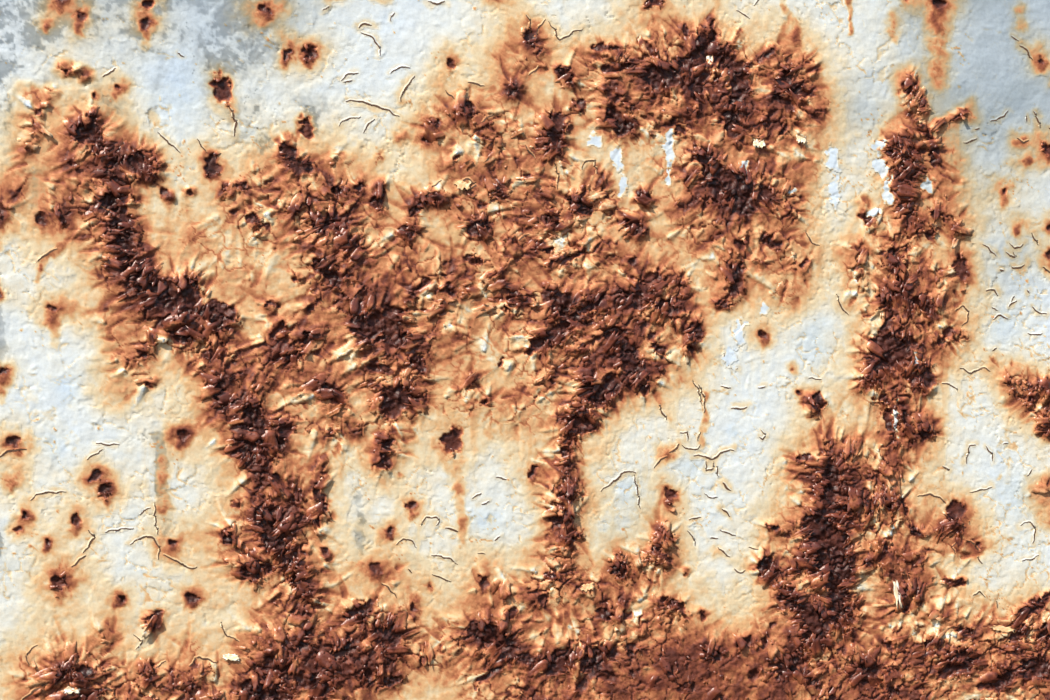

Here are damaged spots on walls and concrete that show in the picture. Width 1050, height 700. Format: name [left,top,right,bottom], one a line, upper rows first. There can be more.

rust [32,0,109,44]
rust [116,0,167,52]
rust [234,0,338,79]
rust [321,0,347,15]
rust [815,0,854,37]
peeling [0,0,348,145]
rust [0,276,18,305]
rust [1013,303,1050,332]
rust [0,359,36,406]